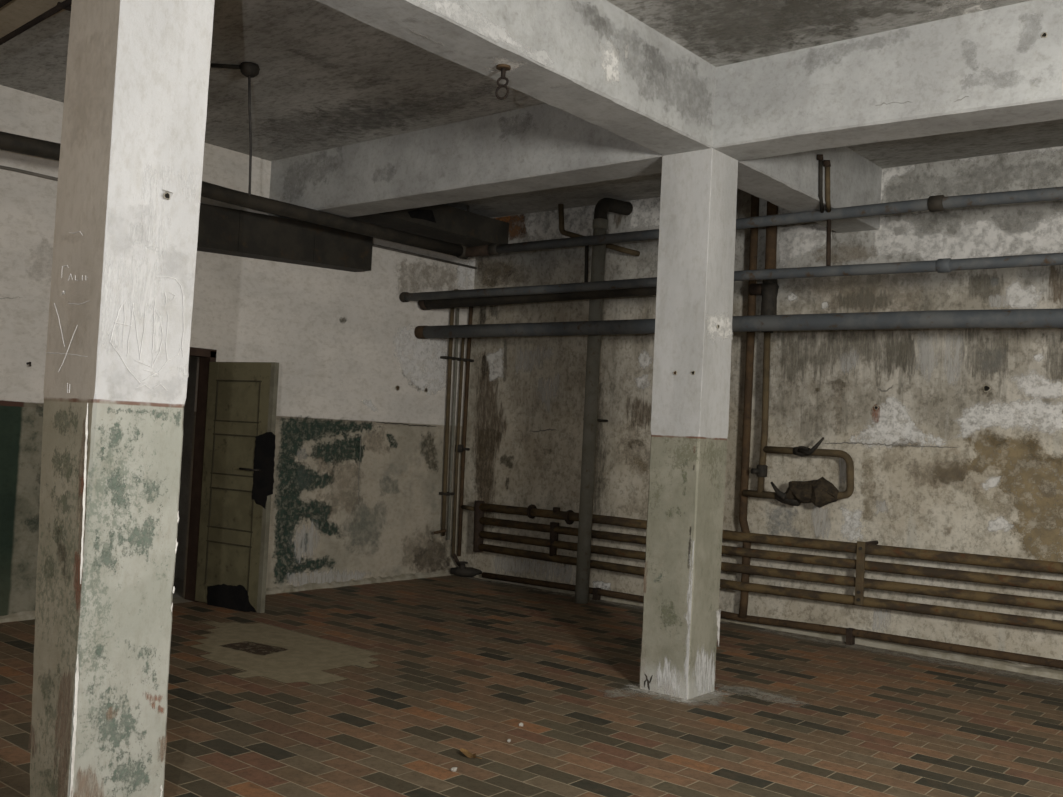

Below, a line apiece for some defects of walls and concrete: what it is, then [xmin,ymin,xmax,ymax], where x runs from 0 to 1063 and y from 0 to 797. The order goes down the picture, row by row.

leakage [666,0,911,62]
leakage [778,329,1006,383]
leakage [421,433,437,470]
leakage [934,430,1063,562]